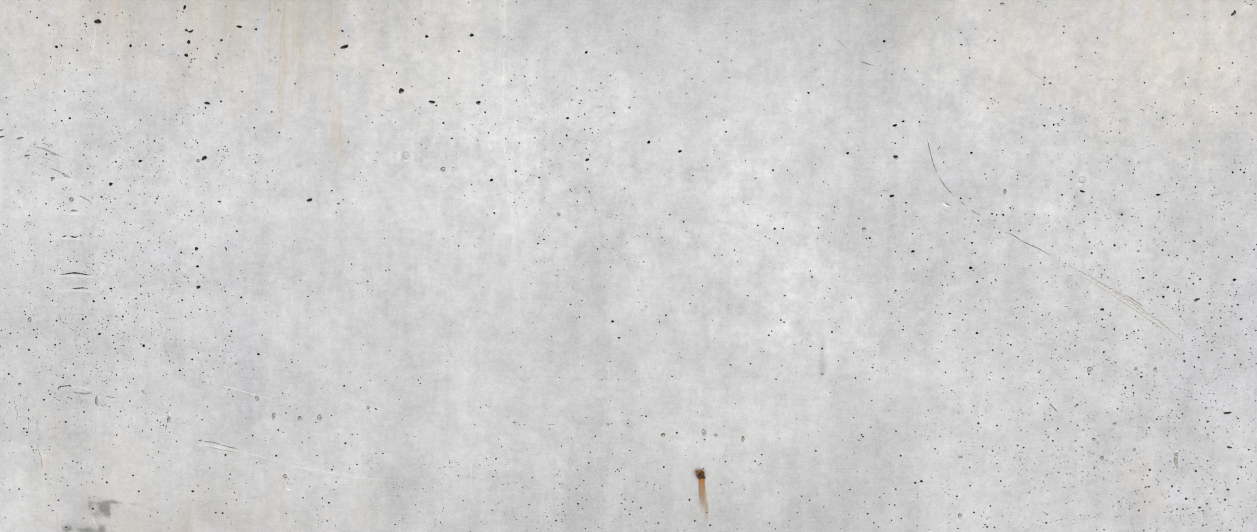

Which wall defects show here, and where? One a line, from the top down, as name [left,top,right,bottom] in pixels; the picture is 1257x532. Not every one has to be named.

rust [696,470,705,500]